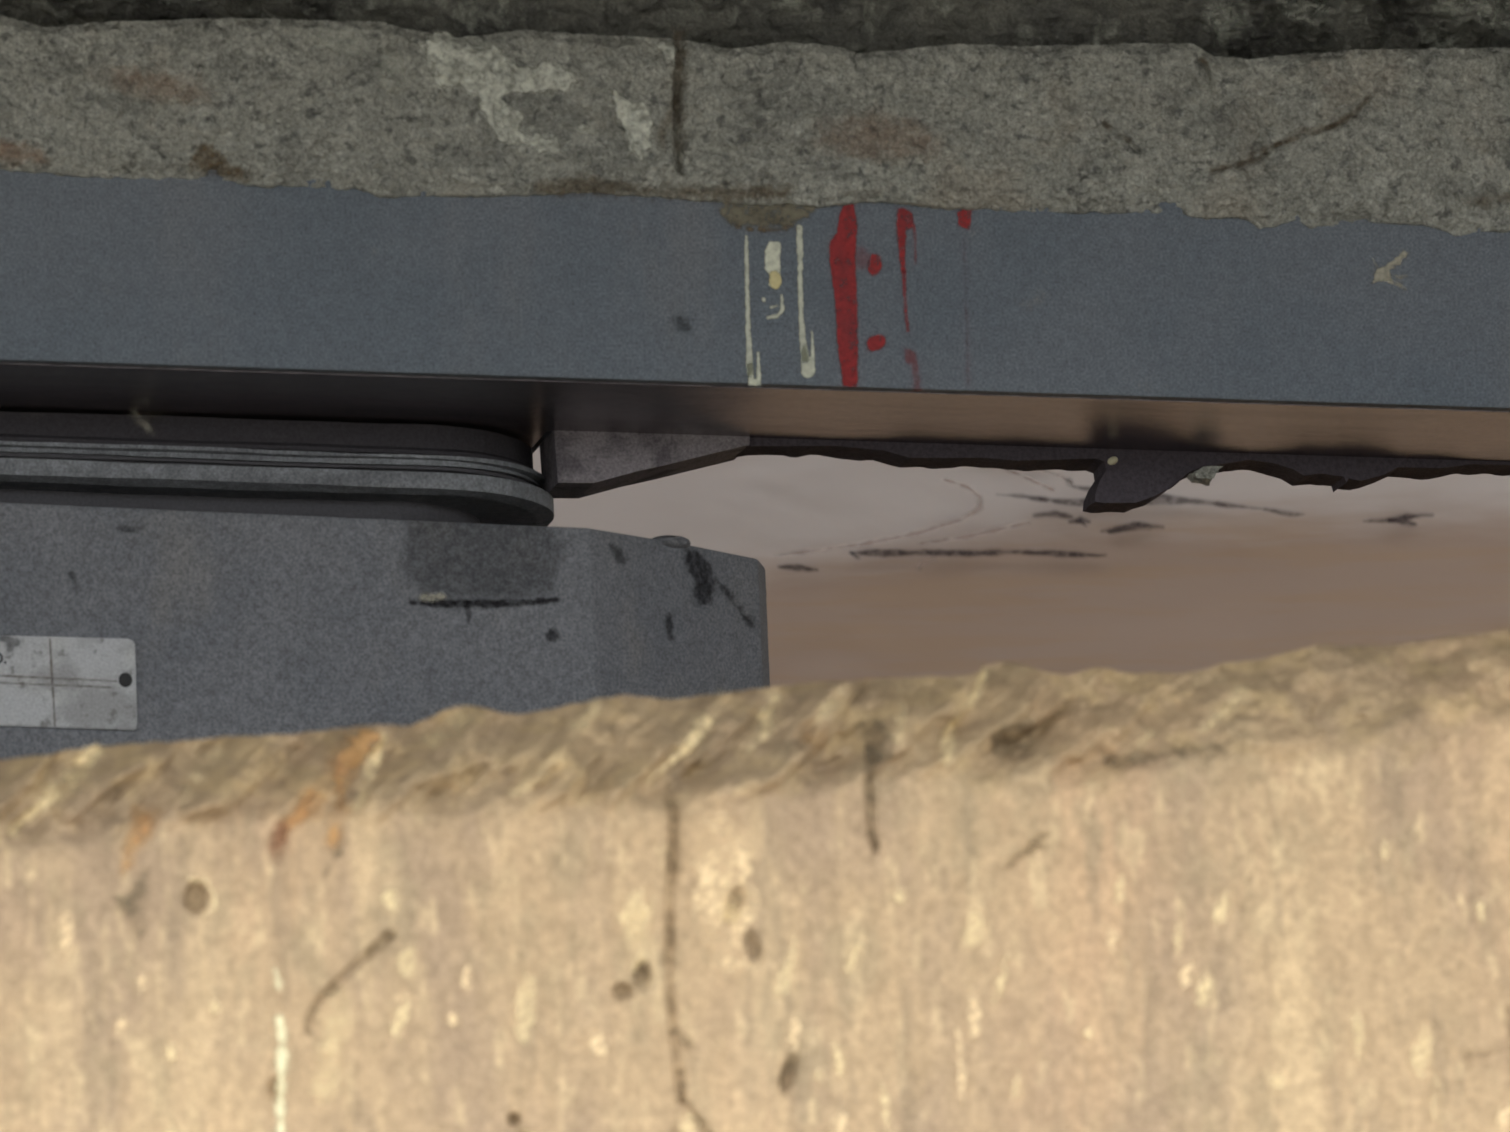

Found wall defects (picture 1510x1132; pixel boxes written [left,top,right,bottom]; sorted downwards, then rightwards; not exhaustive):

crack [1211,97,1369,171]
rust [271,788,320,848]
rust [324,729,381,876]
crack [667,802,678,874]
crack [666,917,674,948]